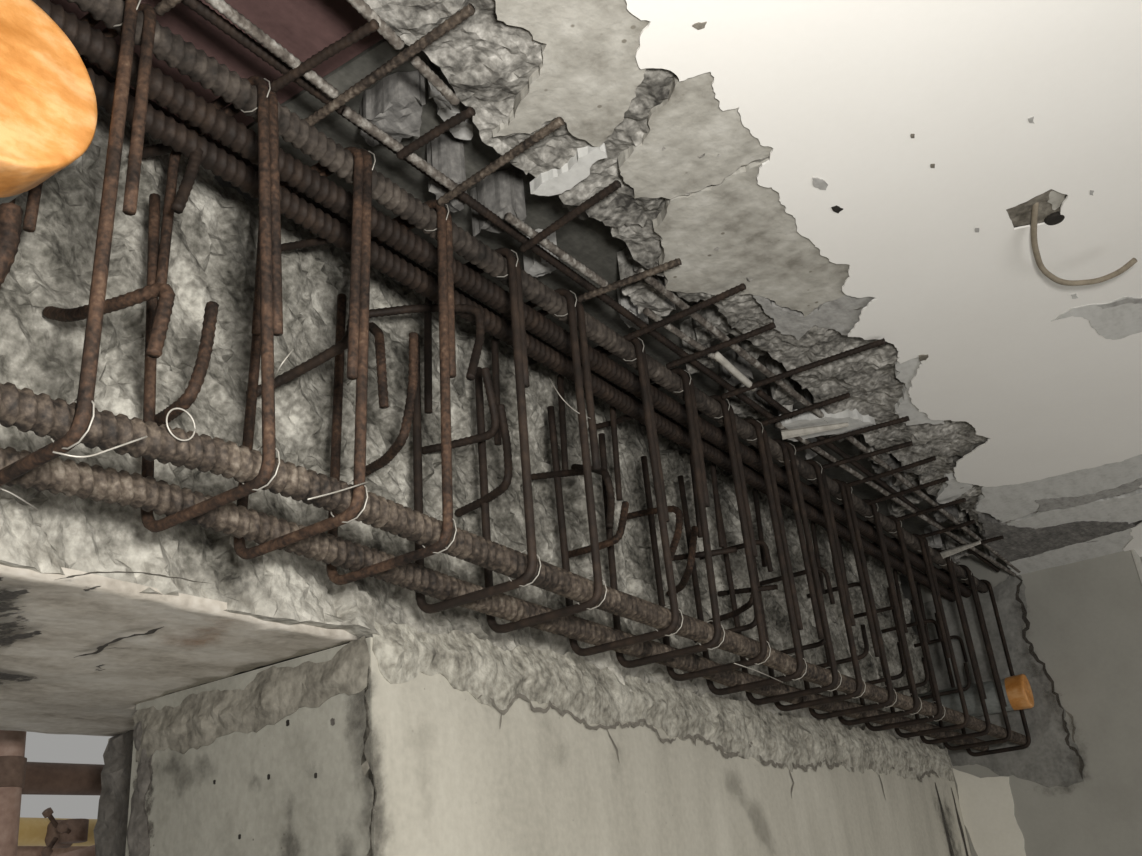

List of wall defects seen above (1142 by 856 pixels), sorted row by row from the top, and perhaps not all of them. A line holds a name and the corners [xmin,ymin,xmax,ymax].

spalling [105,53,170,300]
spalling [0,0,125,470]
spalling [0,577,41,647]
spalling [0,672,36,682]
spalling [361,753,376,856]